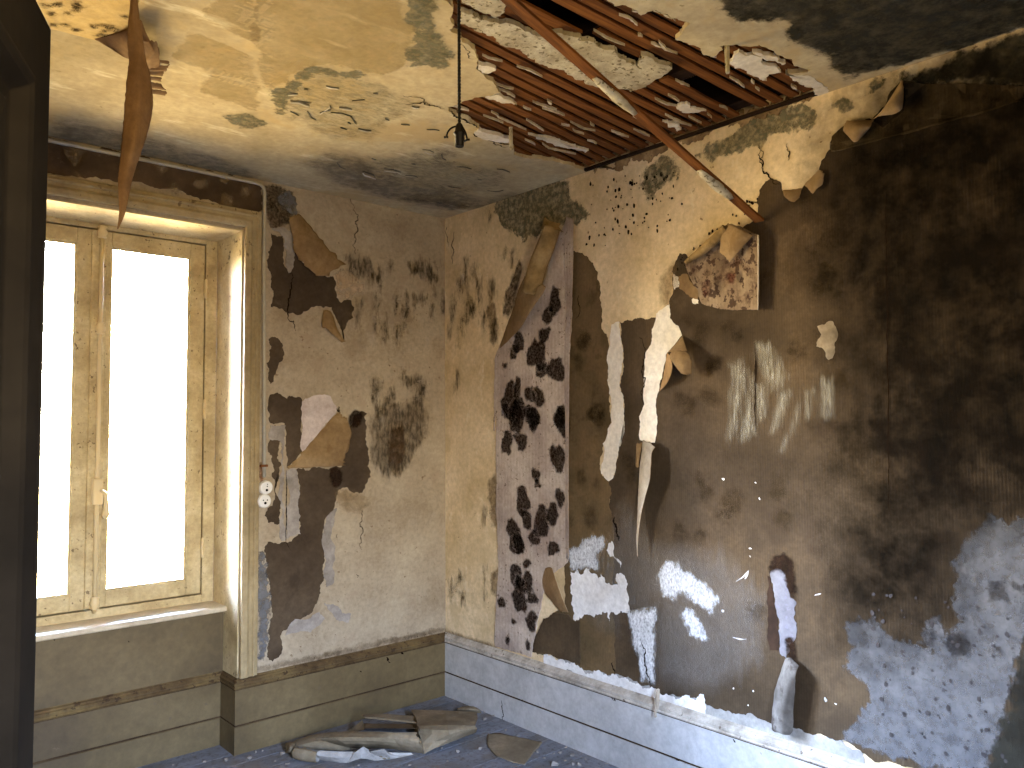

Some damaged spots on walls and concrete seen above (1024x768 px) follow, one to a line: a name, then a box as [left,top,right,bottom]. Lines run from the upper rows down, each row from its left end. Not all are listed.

damp [271,67,364,115]
peeling [288,88,378,132]
spalling [451,0,829,173]
damp [489,155,683,247]
crack [758,144,790,185]
peeling [267,234,354,339]
damp [501,286,565,455]
damp [721,0,1024,768]
damp [549,405,570,473]
peeling [264,337,371,662]
damp [488,469,565,650]
peeling [767,554,797,659]